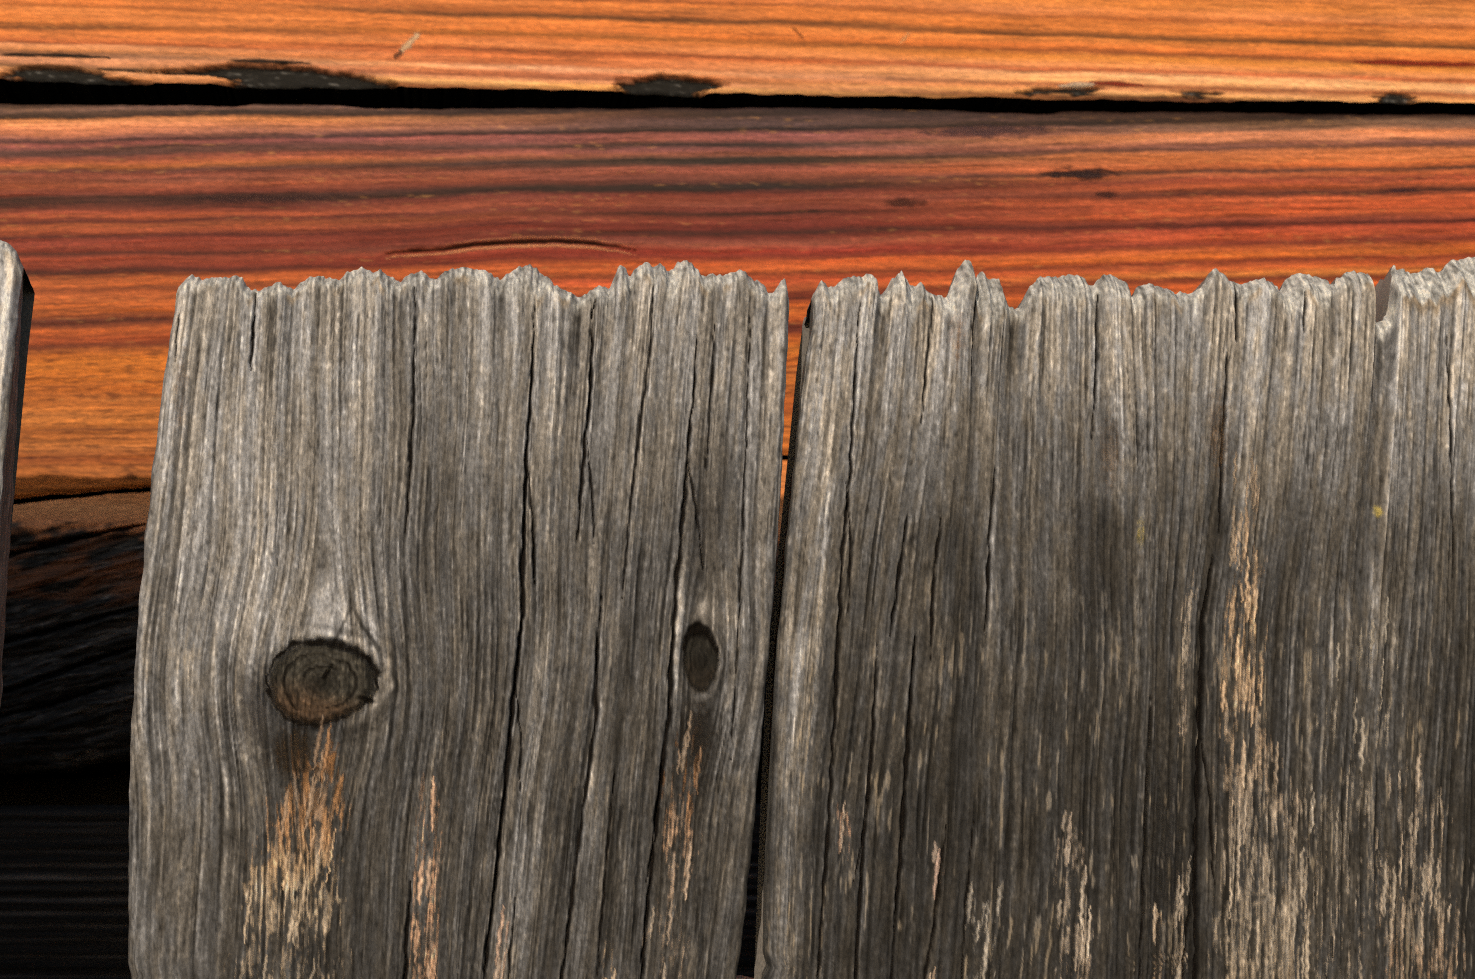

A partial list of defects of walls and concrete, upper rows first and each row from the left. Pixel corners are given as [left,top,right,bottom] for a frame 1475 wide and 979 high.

crack [483,307,535,979]
crack [386,240,636,533]
crack [560,288,654,979]
crack [640,318,751,979]
crack [1138,697,1151,979]
crack [1181,286,1237,979]